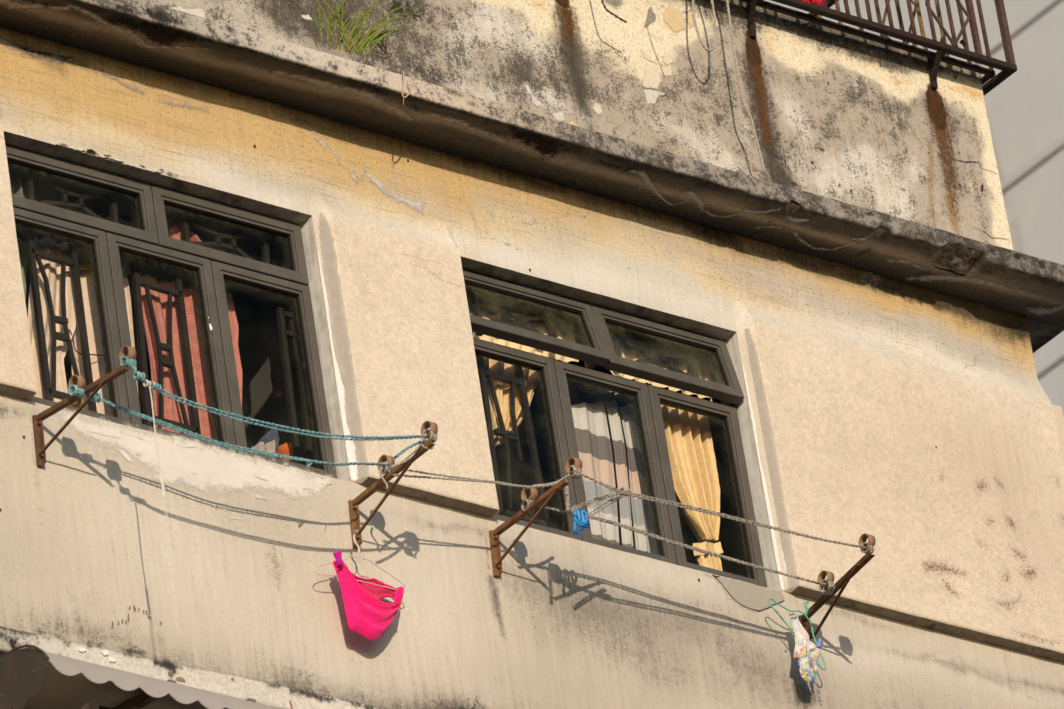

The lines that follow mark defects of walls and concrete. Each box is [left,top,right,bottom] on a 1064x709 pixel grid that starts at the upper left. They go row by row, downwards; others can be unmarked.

leakage [0,0,208,50]
leakage [381,0,440,30]
leakage [503,43,542,91]
rust [554,0,588,114]
leakage [813,33,920,76]
leakage [273,71,413,121]
leakage [427,112,508,144]
rust [745,30,793,187]
leakage [312,130,425,214]
rust [925,83,960,231]
leakage [922,558,968,603]
leakage [794,686,820,707]